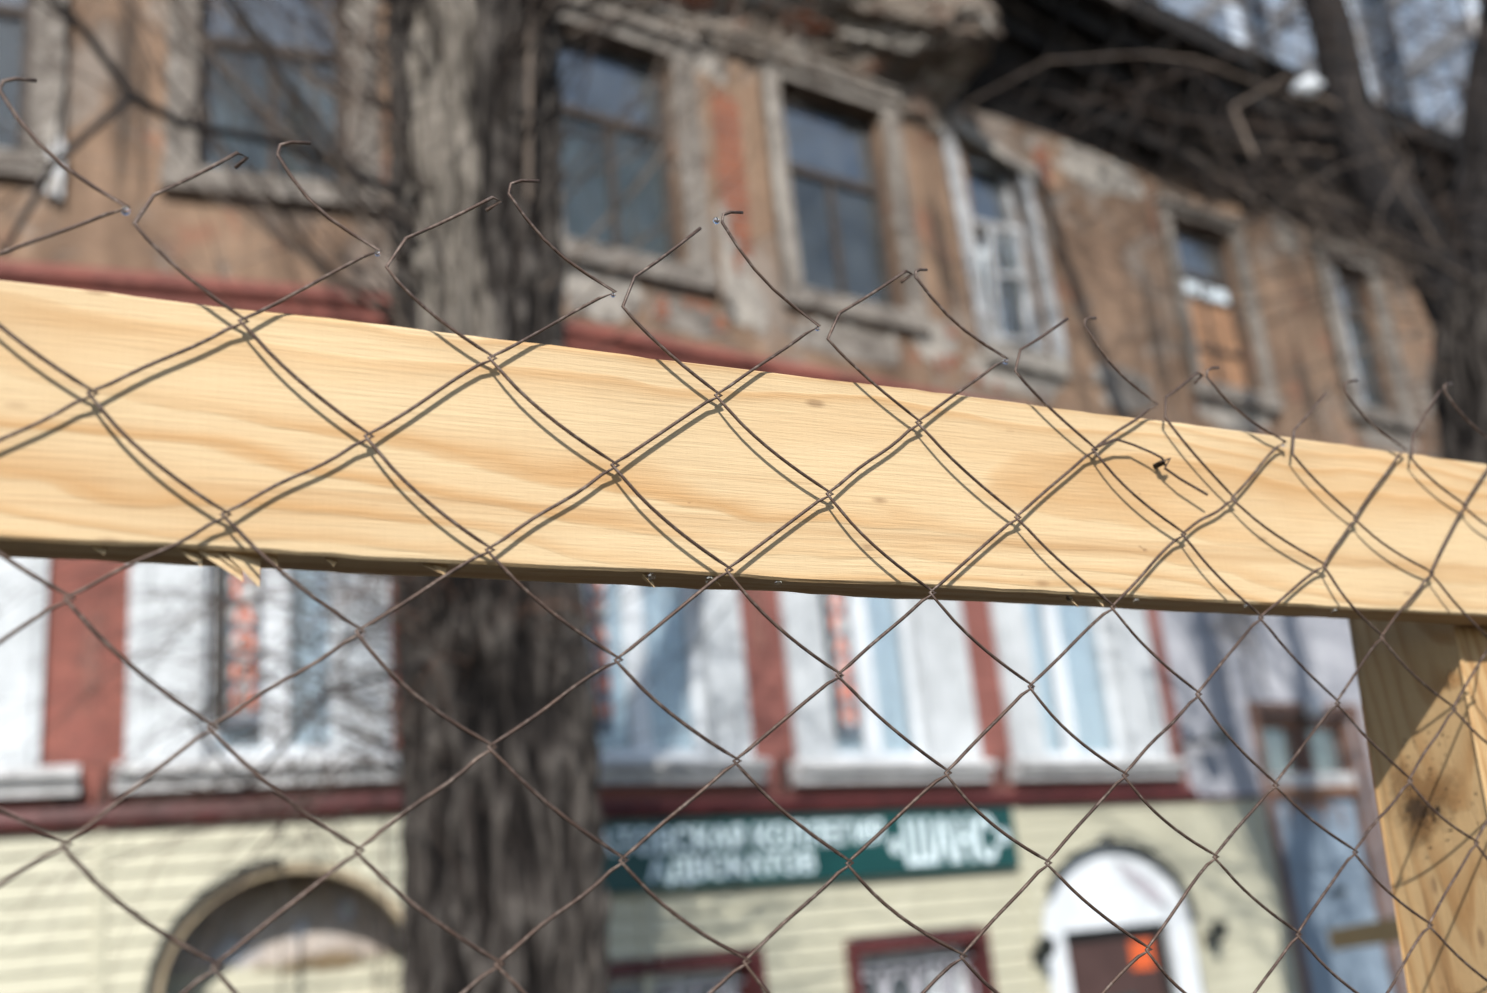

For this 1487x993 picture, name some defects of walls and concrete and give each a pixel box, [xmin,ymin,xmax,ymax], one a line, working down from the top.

flaking render [831,20,936,56]
flaking render [564,44,1064,403]